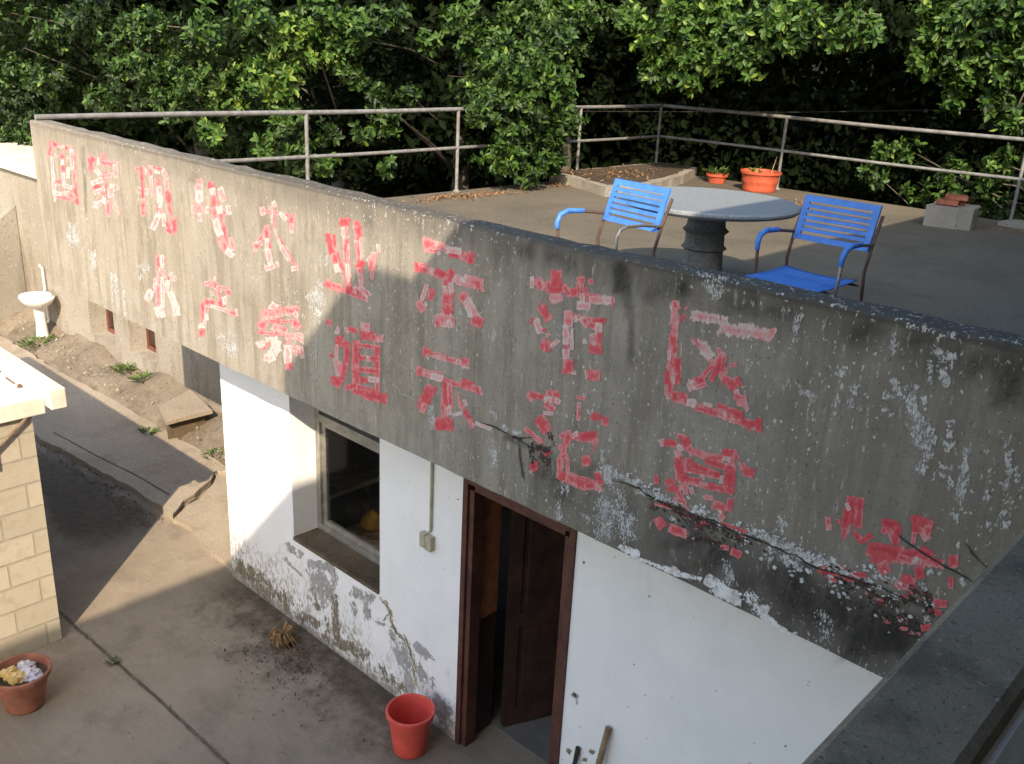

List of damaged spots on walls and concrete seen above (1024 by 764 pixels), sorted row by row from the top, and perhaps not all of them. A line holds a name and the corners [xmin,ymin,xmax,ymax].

crack [479,422,551,483]
flaking render [596,449,944,637]
crack [608,467,935,640]
crack [898,535,987,582]
crack [379,596,420,690]
peeling [349,586,456,732]